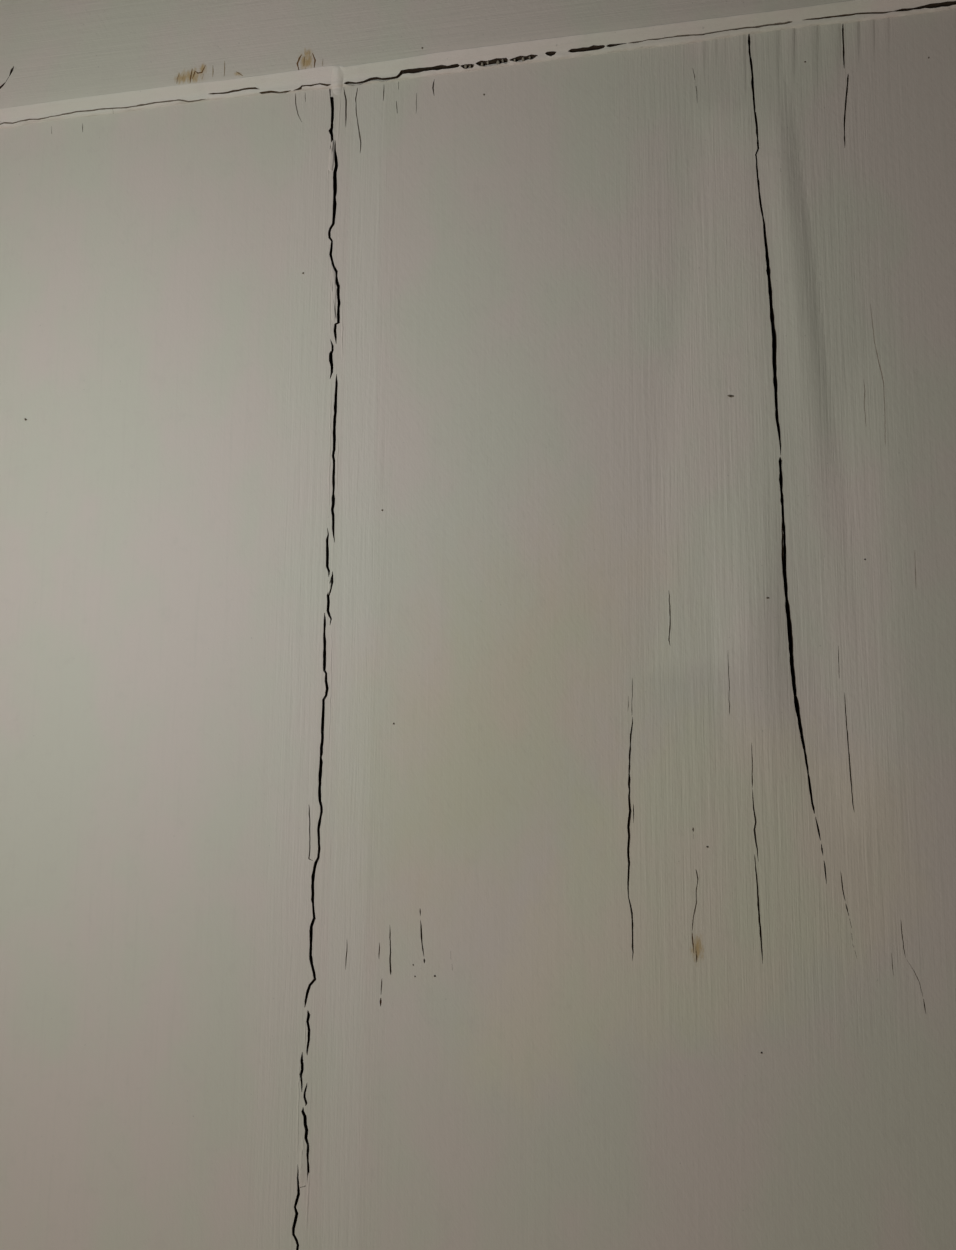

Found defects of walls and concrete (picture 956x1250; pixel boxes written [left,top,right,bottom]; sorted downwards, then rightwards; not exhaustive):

crack [805,1,956,145]
crack [863,305,886,443]
crack [568,21,827,884]
crack [0,51,556,1250]
crack [626,682,634,959]
crack [691,870,699,962]
crack [751,745,763,962]
crack [844,692,854,809]
crack [891,924,926,1013]